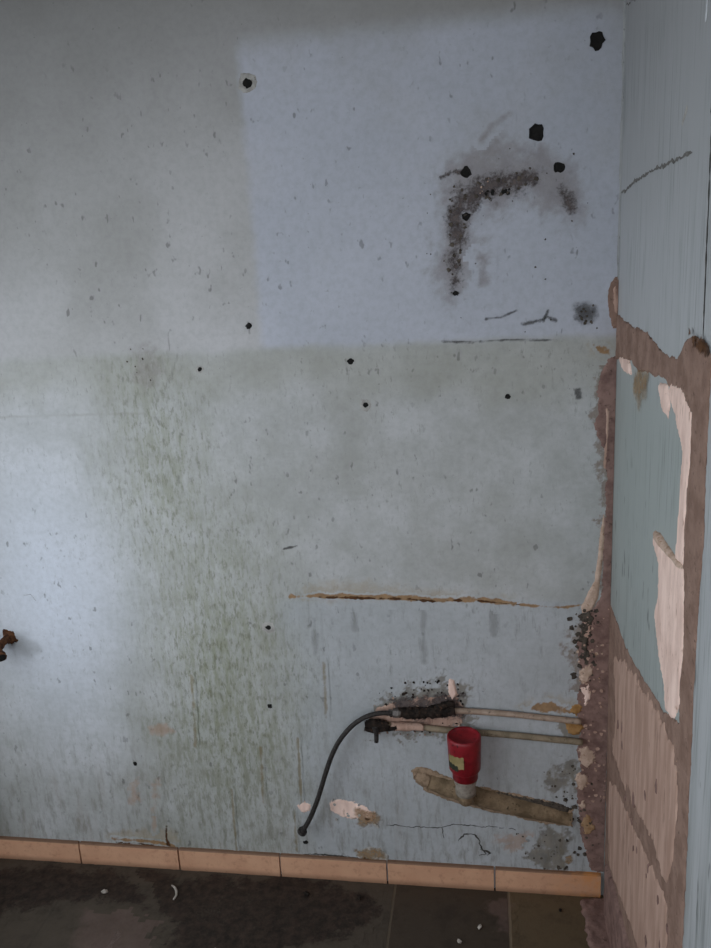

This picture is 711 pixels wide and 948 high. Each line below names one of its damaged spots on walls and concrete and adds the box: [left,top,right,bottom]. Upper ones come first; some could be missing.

mould [403,105,610,333]
damp [119,330,177,407]
spalling [552,277,711,948]
spalling [350,667,488,753]
peeling [329,799,380,829]
damp [480,823,582,871]
damp [531,748,581,808]